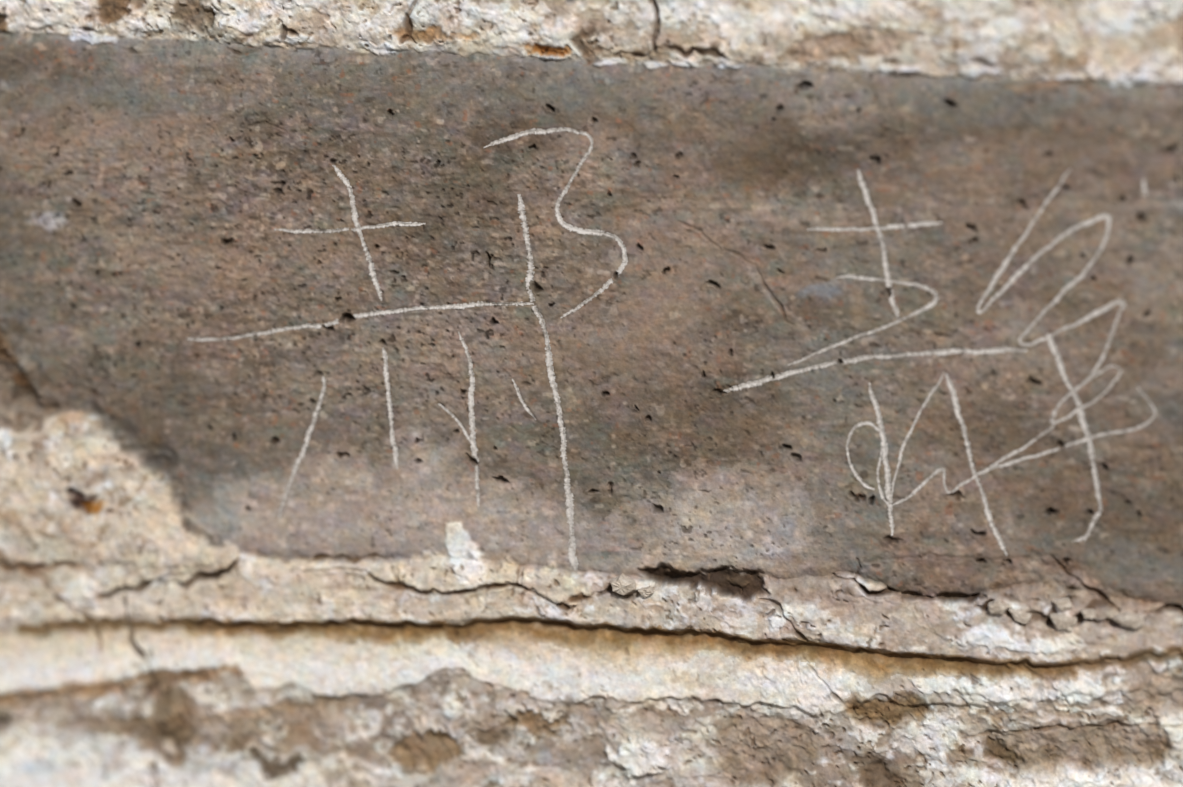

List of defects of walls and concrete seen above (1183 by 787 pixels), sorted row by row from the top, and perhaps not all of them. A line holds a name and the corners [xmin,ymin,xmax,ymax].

crack [612,0,744,67]
spalling [0,308,232,550]
spalling [610,536,864,622]
crack [0,551,1183,719]
crack [143,740,163,787]
crack [959,720,1183,742]